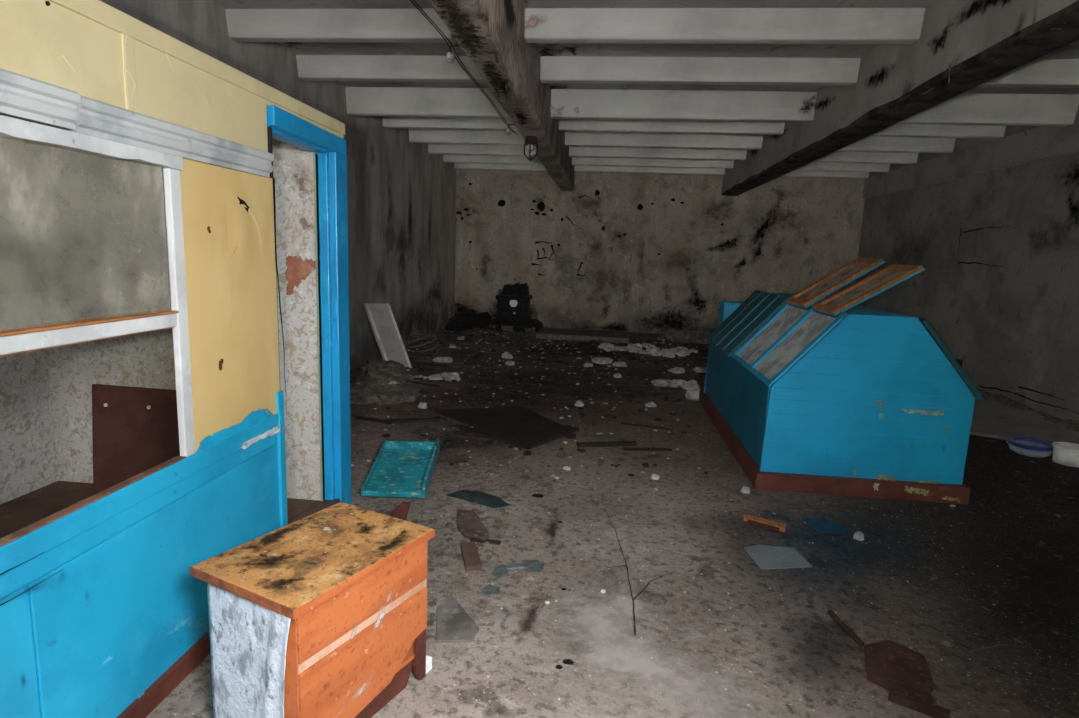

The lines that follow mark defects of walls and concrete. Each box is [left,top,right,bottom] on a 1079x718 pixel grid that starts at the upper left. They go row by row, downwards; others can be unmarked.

water stain [479,0,539,95]
water stain [932,0,1008,55]
water stain [1062,163,1079,227]
water stain [710,202,779,271]
water stain [640,285,707,332]